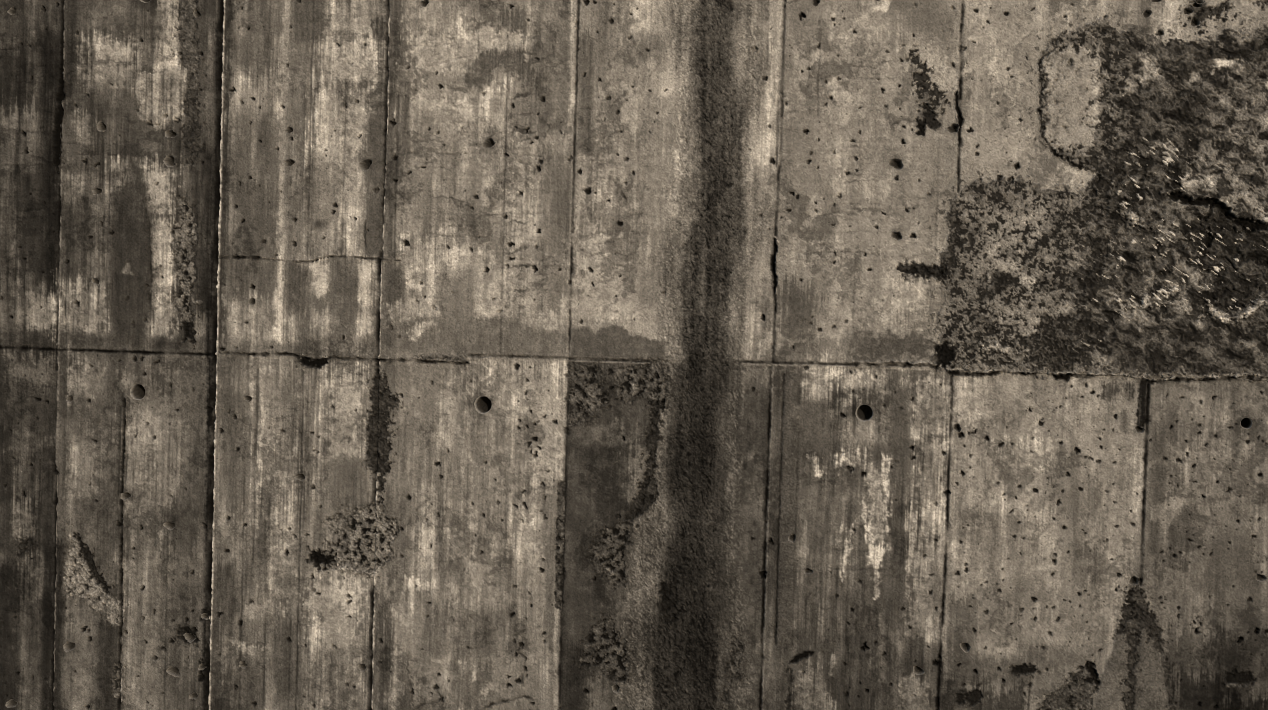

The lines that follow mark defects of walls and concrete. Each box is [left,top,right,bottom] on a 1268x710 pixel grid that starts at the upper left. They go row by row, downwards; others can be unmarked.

spalling [165,186,204,350]
crack [218,219,402,264]
spalling [890,0,1268,383]
leakage [275,0,829,710]
spalling [303,367,404,582]
spalling [559,353,674,593]
spalling [55,523,133,630]
spalling [553,481,567,610]
spalling [570,612,636,692]
spalling [1006,661,1042,684]
spalling [1034,653,1106,710]